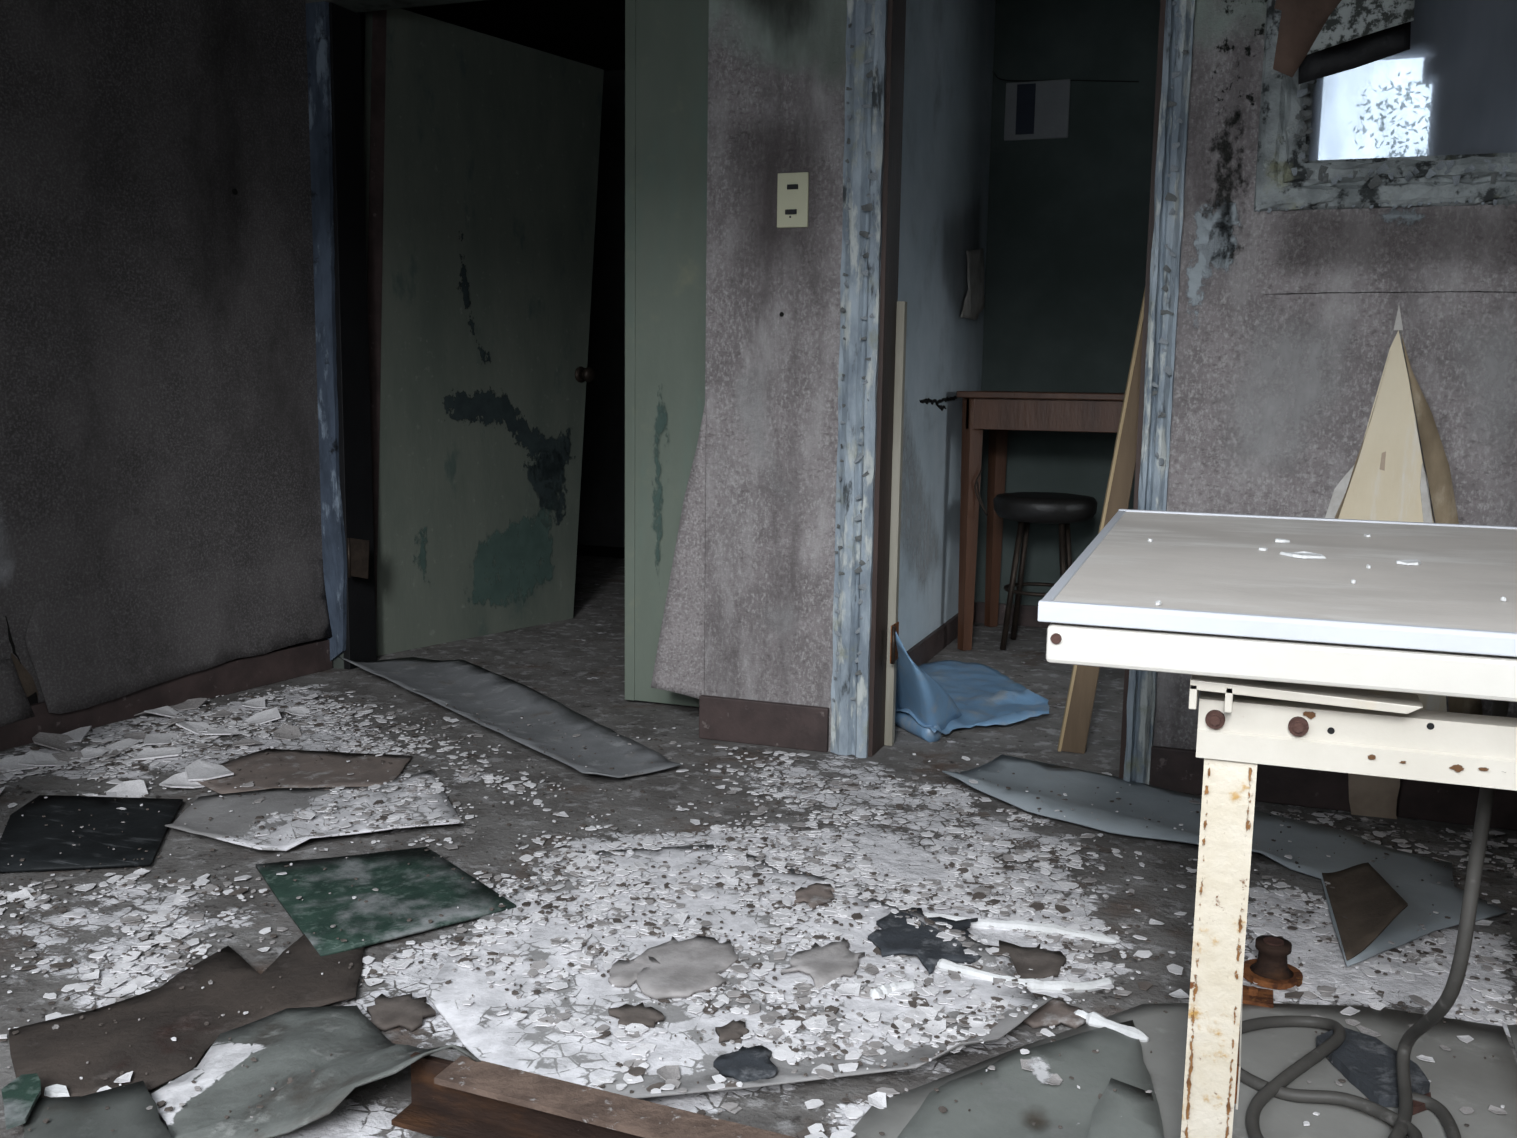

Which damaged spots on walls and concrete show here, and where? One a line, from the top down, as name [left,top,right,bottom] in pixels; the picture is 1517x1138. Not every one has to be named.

peeling [843,152,877,293]
water stain [1187,0,1268,328]
peeling [1257,68,1509,213]
peeling [840,307,874,401]
peeling [443,386,575,525]
peeling [833,404,869,680]